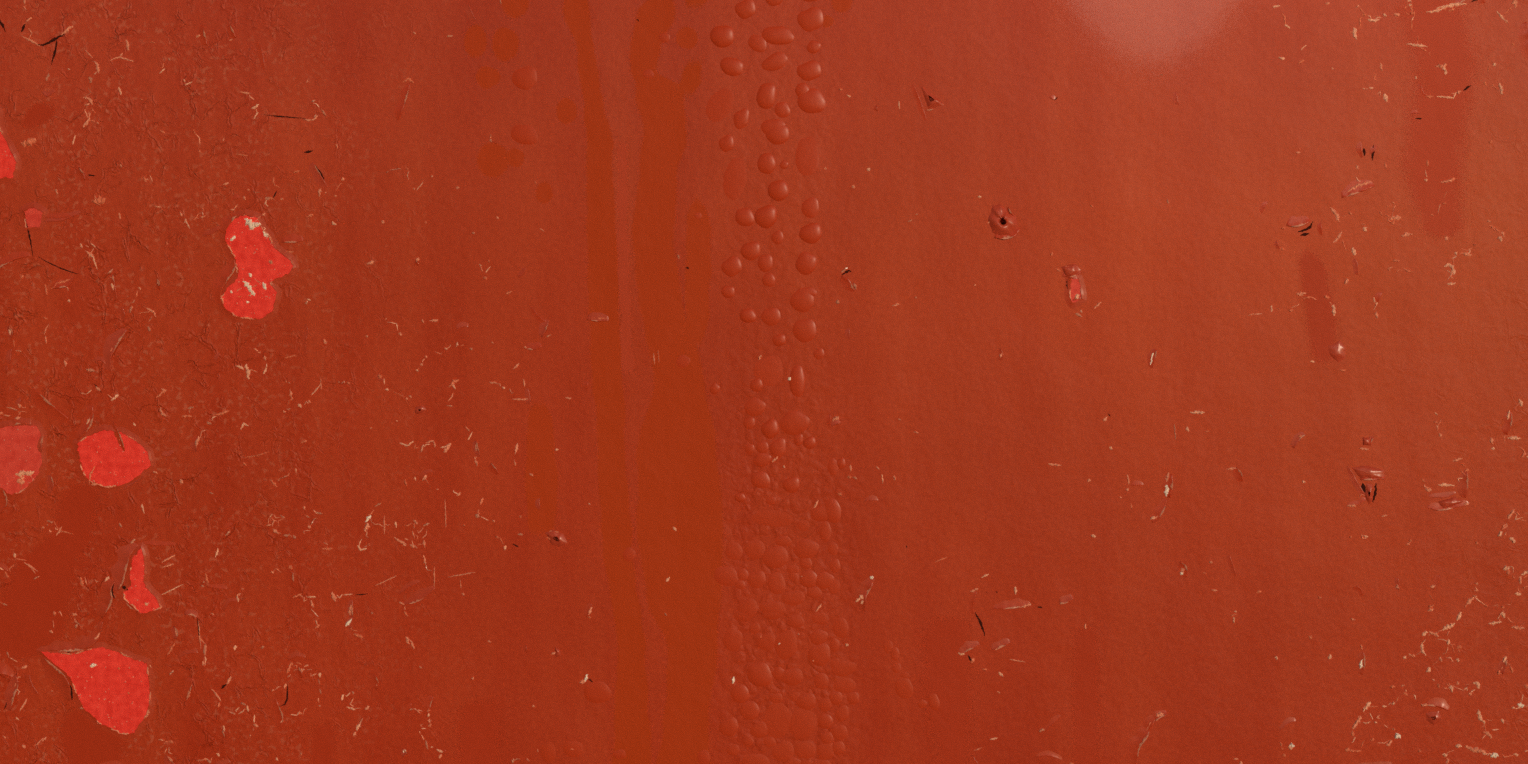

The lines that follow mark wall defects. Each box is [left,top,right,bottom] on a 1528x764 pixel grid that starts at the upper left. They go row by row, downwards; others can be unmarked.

spalling [0,106,37,184]
spalling [218,209,299,324]
spalling [0,420,47,500]
spalling [72,418,156,493]
peeling [1427,457,1469,511]
peeling [1420,597,1475,672]
spalling [36,621,155,739]
spalling [1359,733,1401,764]
peeling [1442,709,1499,758]